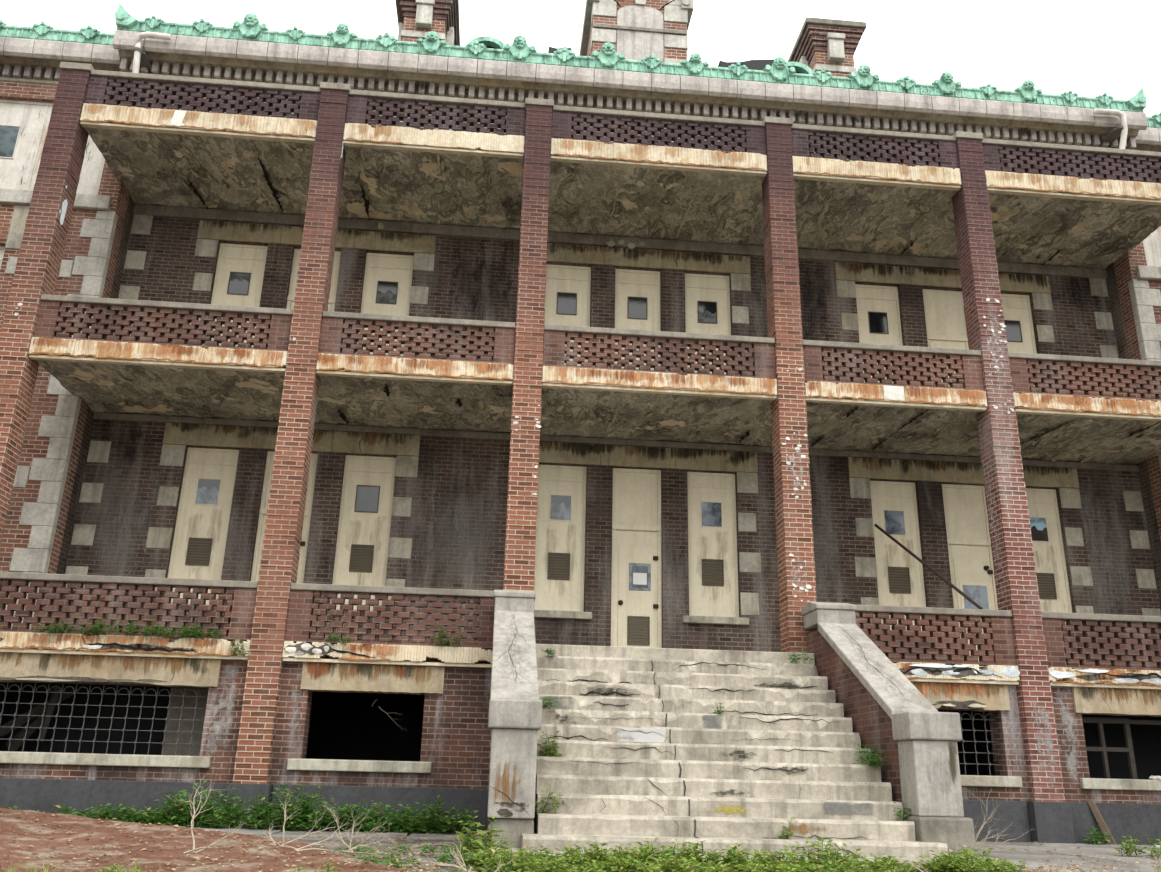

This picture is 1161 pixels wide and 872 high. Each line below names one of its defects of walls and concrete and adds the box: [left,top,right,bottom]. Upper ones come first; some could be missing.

rust [554,140,762,169]
crack [256,154,290,213]
damp [547,243,743,264]
rust [31,338,283,367]
rust [548,366,776,395]
rust [1018,393,1161,416]
spalling [81,636,197,652]
spalling [284,642,376,658]
spalling [899,664,1020,678]
spalling [1050,669,1161,684]
crack [496,614,692,837]
crack [673,662,831,796]